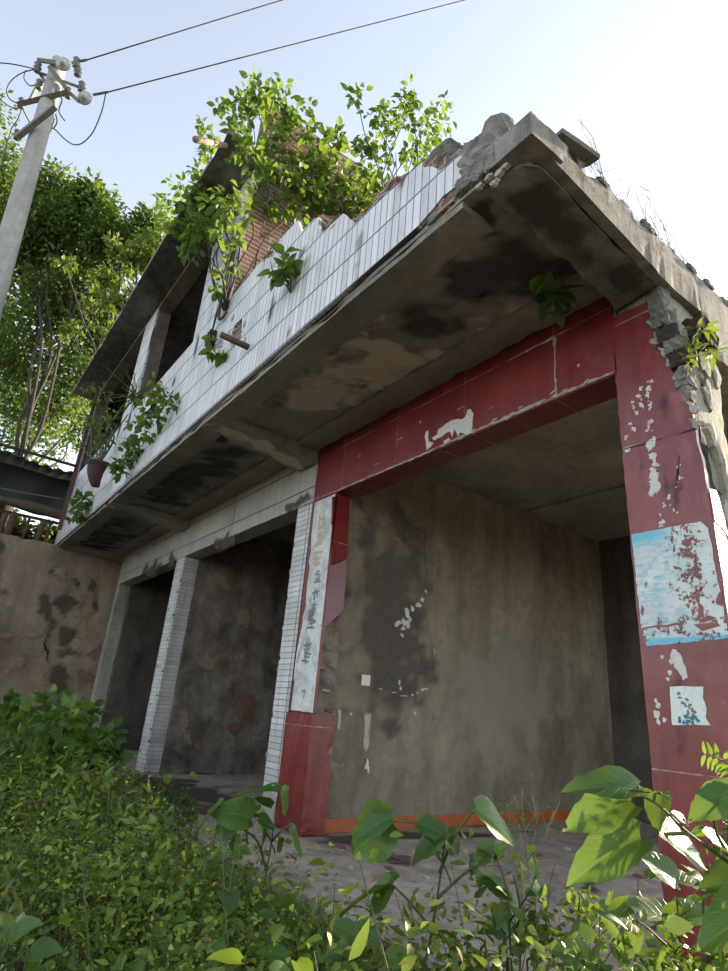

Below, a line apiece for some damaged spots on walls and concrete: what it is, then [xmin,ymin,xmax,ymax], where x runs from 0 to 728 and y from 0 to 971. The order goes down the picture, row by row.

spalling [426,111,601,226]
damp [445,185,591,315]
spalling [686,263,728,307]
damp [145,425,304,512]
damp [214,532,235,549]
damp [285,492,310,512]
damp [285,305,491,423]
peeling [338,336,613,491]
peeling [624,379,684,528]
spalling [645,286,722,430]
damp [37,594,79,706]
peeling [661,649,688,681]